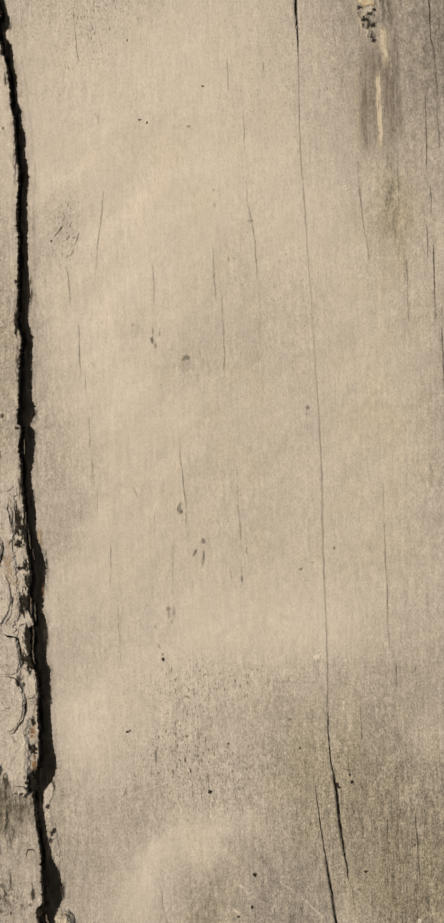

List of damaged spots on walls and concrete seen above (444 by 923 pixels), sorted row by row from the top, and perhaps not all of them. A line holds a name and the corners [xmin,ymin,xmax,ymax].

crack [292,0,300,53]
crack [0,0,64,923]
peeling [0,484,37,798]
crack [316,717,348,923]